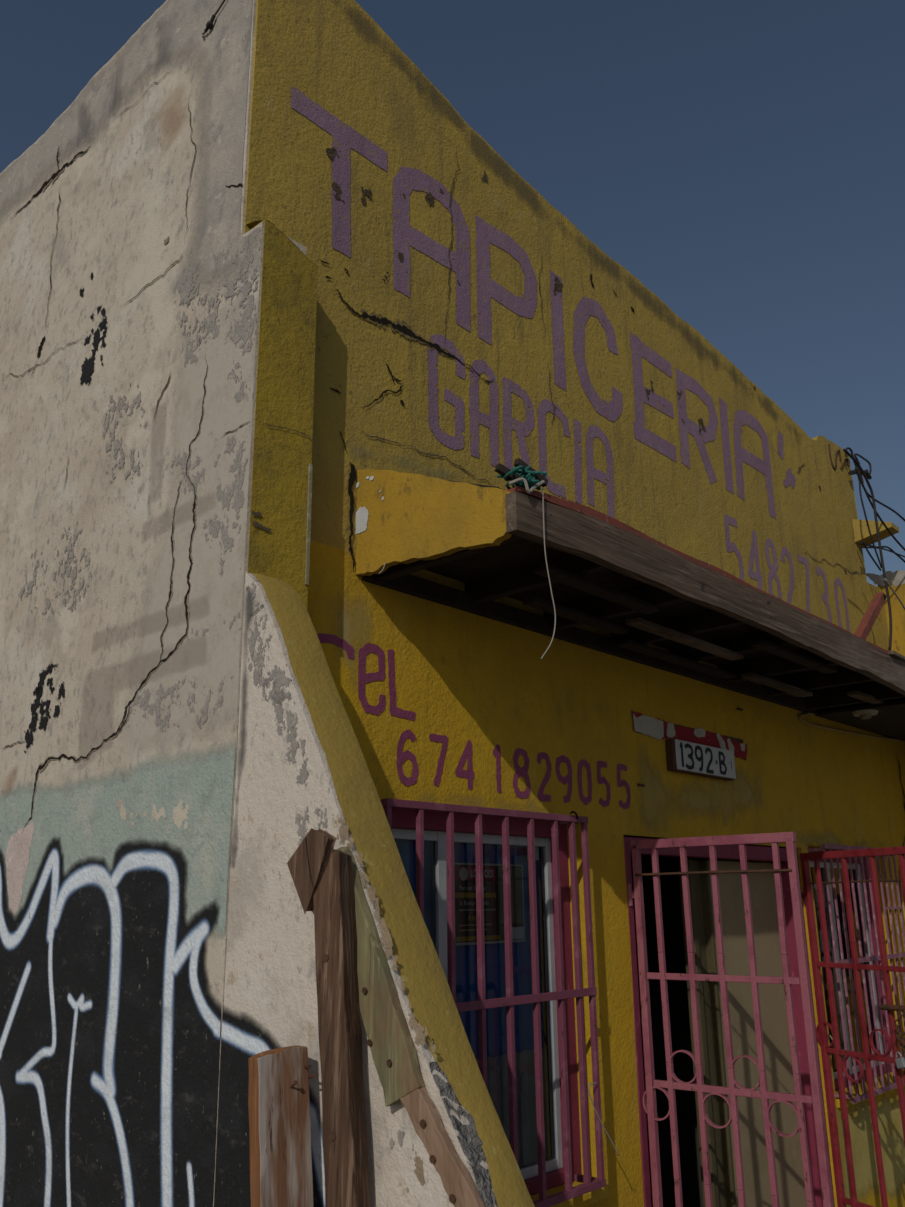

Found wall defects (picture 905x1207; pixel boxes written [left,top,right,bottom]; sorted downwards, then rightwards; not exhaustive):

crack [3,145,91,381]
crack [116,72,196,304]
crack [321,127,493,383]
crack [0,350,494,832]